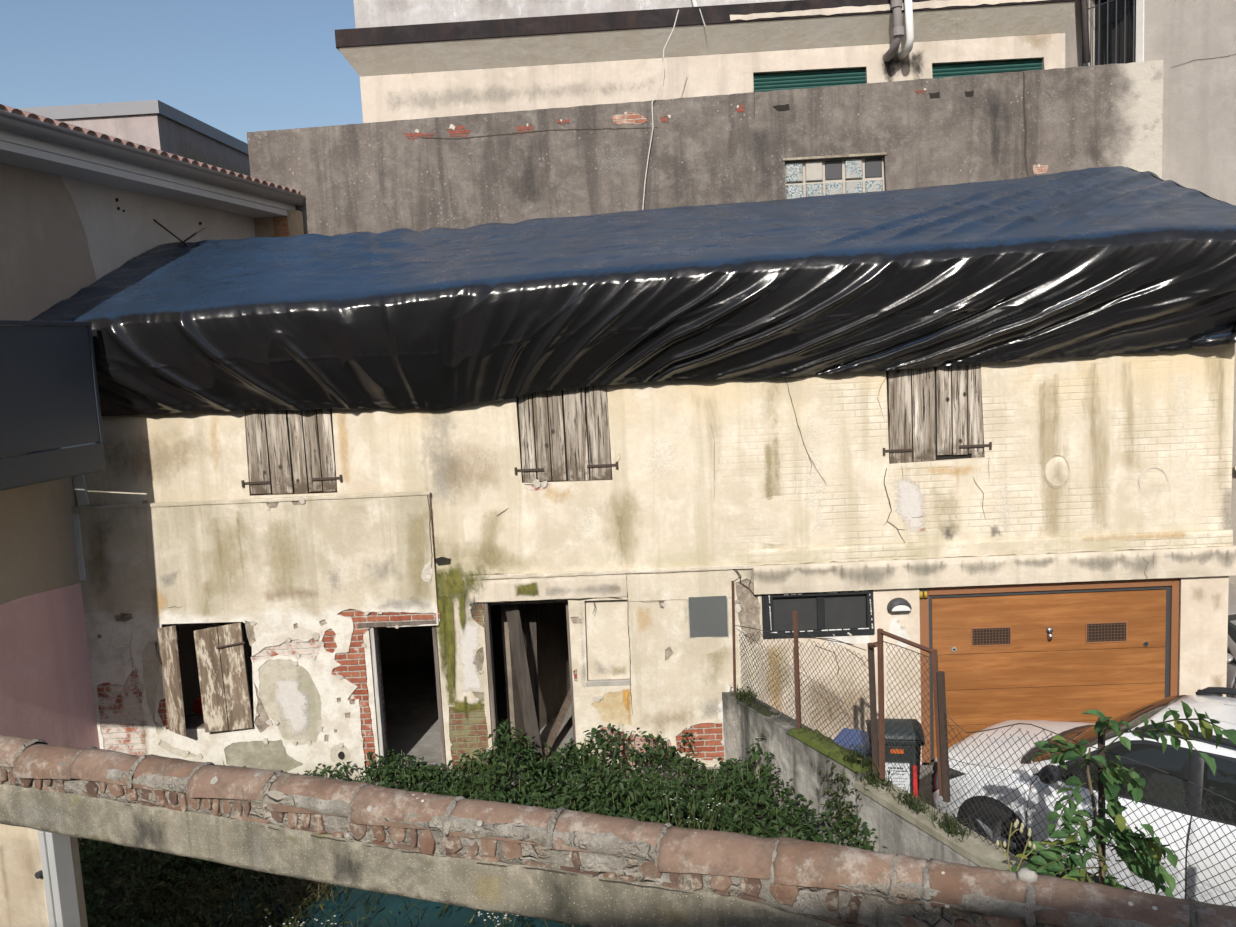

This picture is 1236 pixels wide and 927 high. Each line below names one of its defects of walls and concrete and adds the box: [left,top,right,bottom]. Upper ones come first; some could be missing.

crack [883,466,924,541]
peeling [896,479,924,530]
water stain [842,570,891,581]
spalling [97,640,203,759]
peeling [224,609,440,772]
spalling [591,686,739,768]